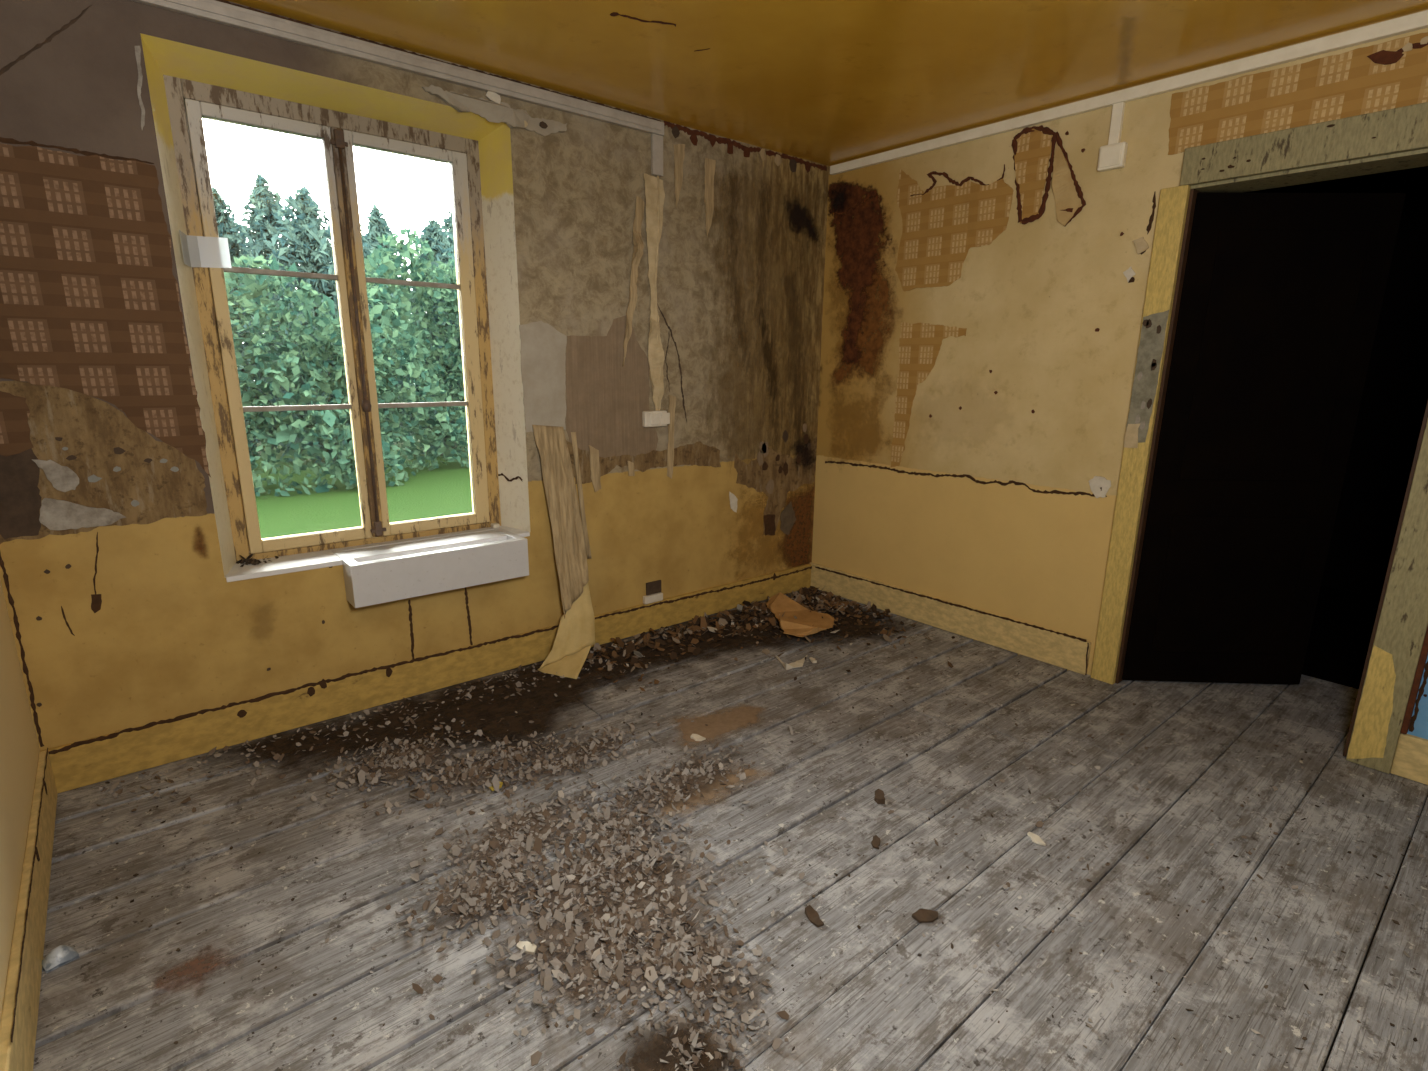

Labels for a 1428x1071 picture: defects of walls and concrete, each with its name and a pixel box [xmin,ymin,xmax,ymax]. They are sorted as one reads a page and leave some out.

crack [0,5,92,75]
crack [0,137,154,164]
crack [216,0,827,173]
water stain [787,182,895,385]
spalling [0,380,207,544]
spalling [565,316,817,536]
water stain [794,440,815,469]
crack [825,461,1107,497]
peeling [1124,310,1169,448]
crack [61,532,102,636]
crack [595,566,1089,675]
crack [0,552,559,1043]